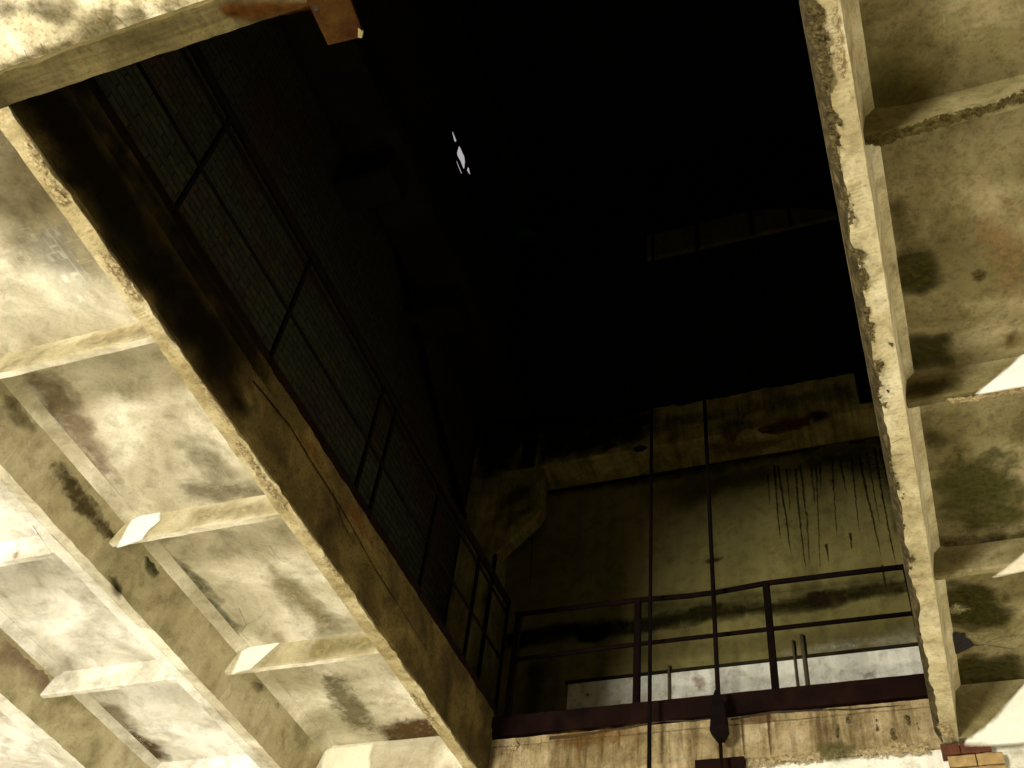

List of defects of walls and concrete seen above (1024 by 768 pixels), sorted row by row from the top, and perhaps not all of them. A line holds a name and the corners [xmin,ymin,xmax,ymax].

spalling [805,0,847,176]
spalling [865,89,1024,147]
spalling [843,193,856,225]
leakage [896,246,939,294]
spalling [851,248,890,408]
leakage [909,335,951,368]
leakage [924,431,945,446]
leakage [51,463,114,539]
leakage [504,388,907,647]
leakage [935,450,1023,547]
leakage [947,583,1011,629]
leakage [324,676,369,726]